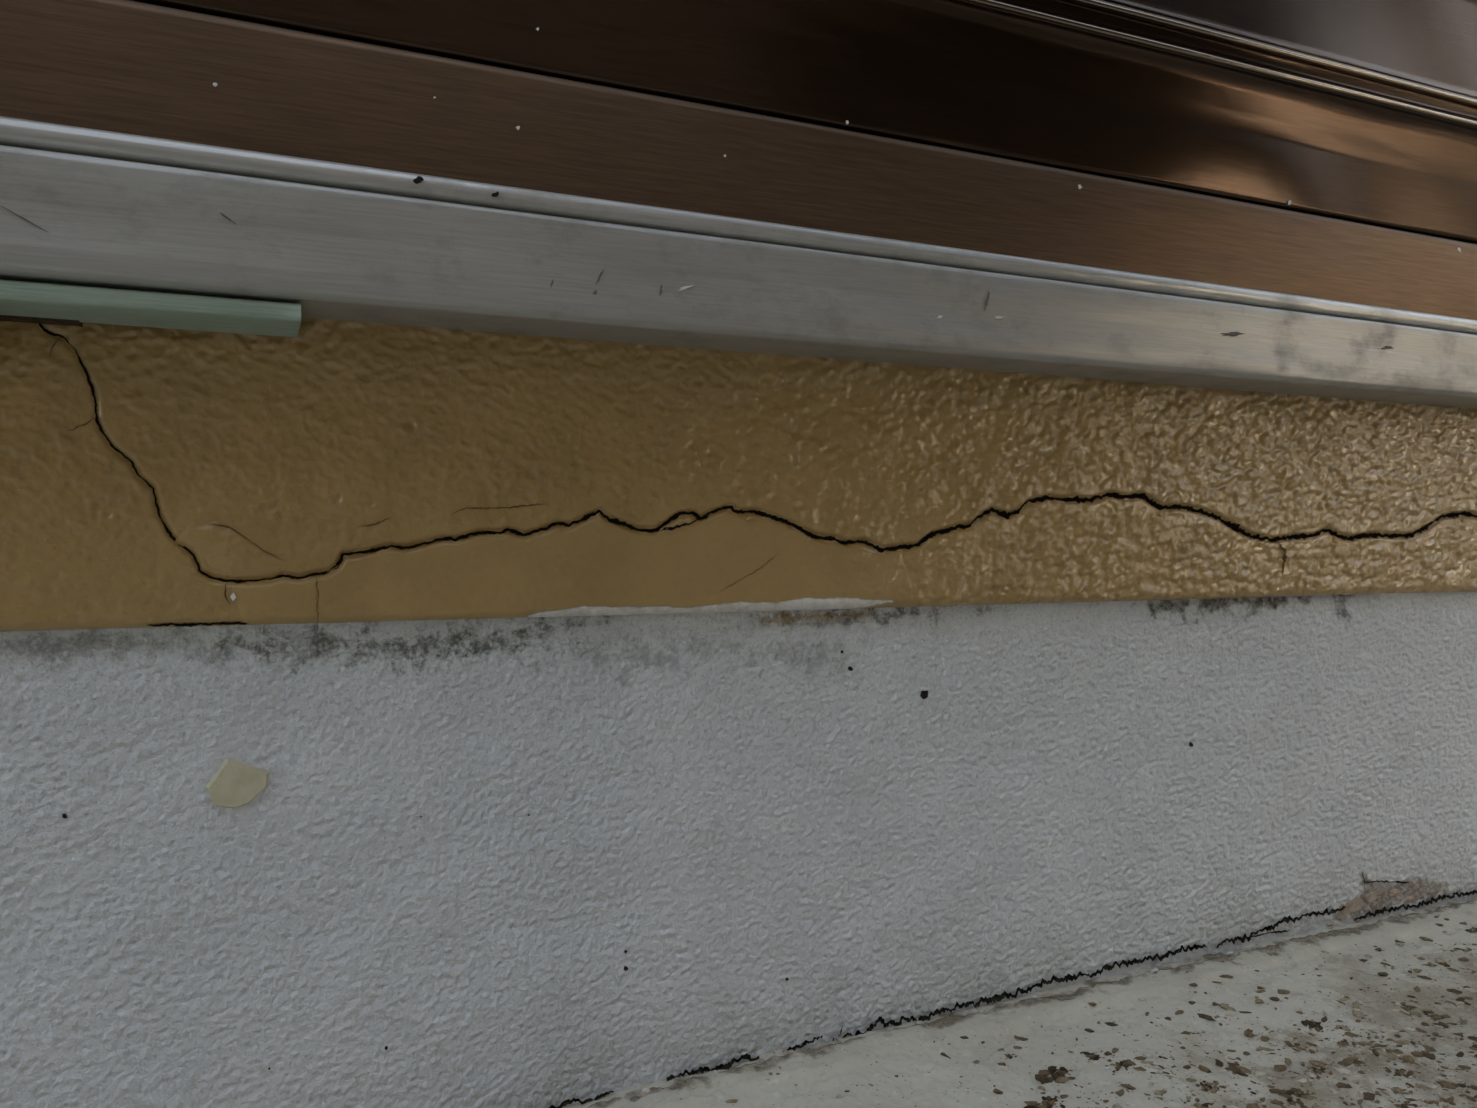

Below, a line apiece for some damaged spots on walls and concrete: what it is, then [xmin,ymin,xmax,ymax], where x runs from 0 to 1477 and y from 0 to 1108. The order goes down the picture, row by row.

crack [37,323,1477,630]
damp [775,607,938,625]
damp [1149,596,1311,622]
damp [287,617,550,674]
crack [549,873,1477,1108]